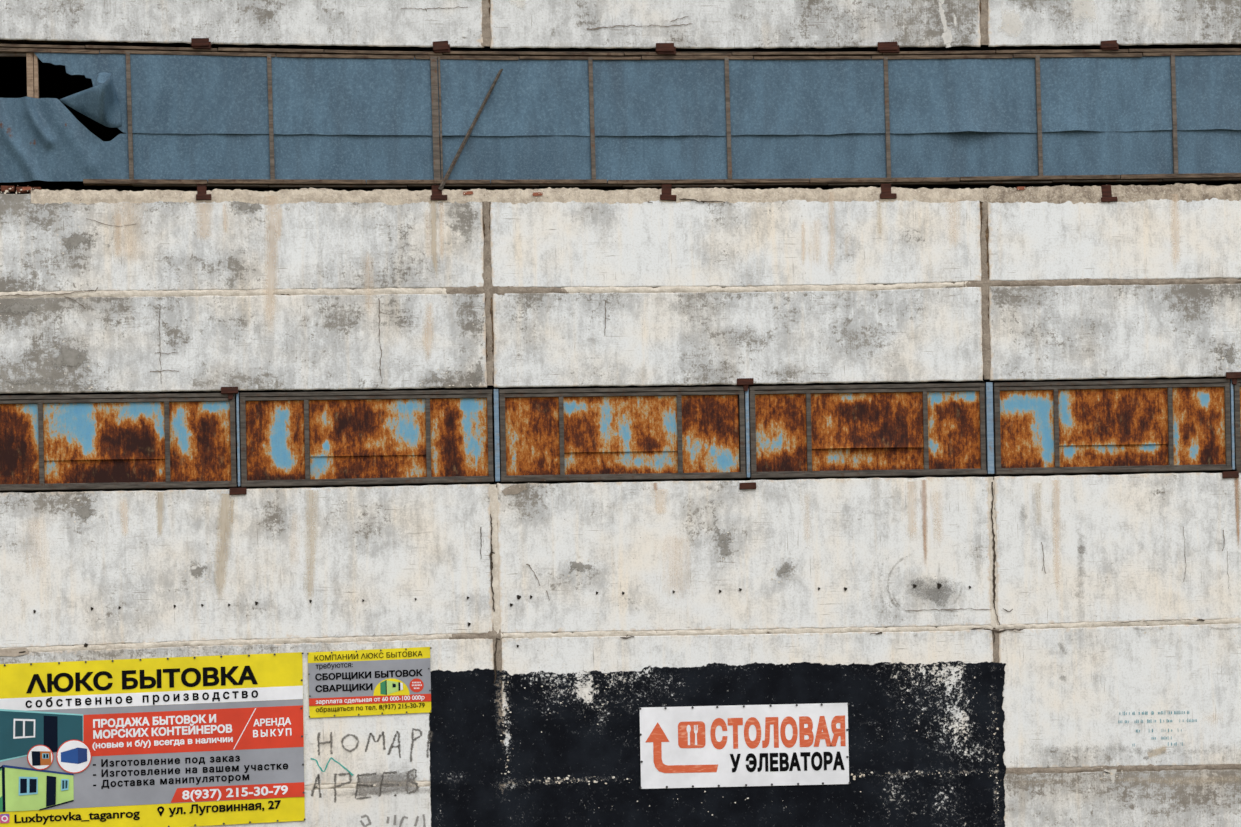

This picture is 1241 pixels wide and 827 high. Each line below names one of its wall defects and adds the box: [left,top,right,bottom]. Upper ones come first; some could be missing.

damp [938,0,957,48]